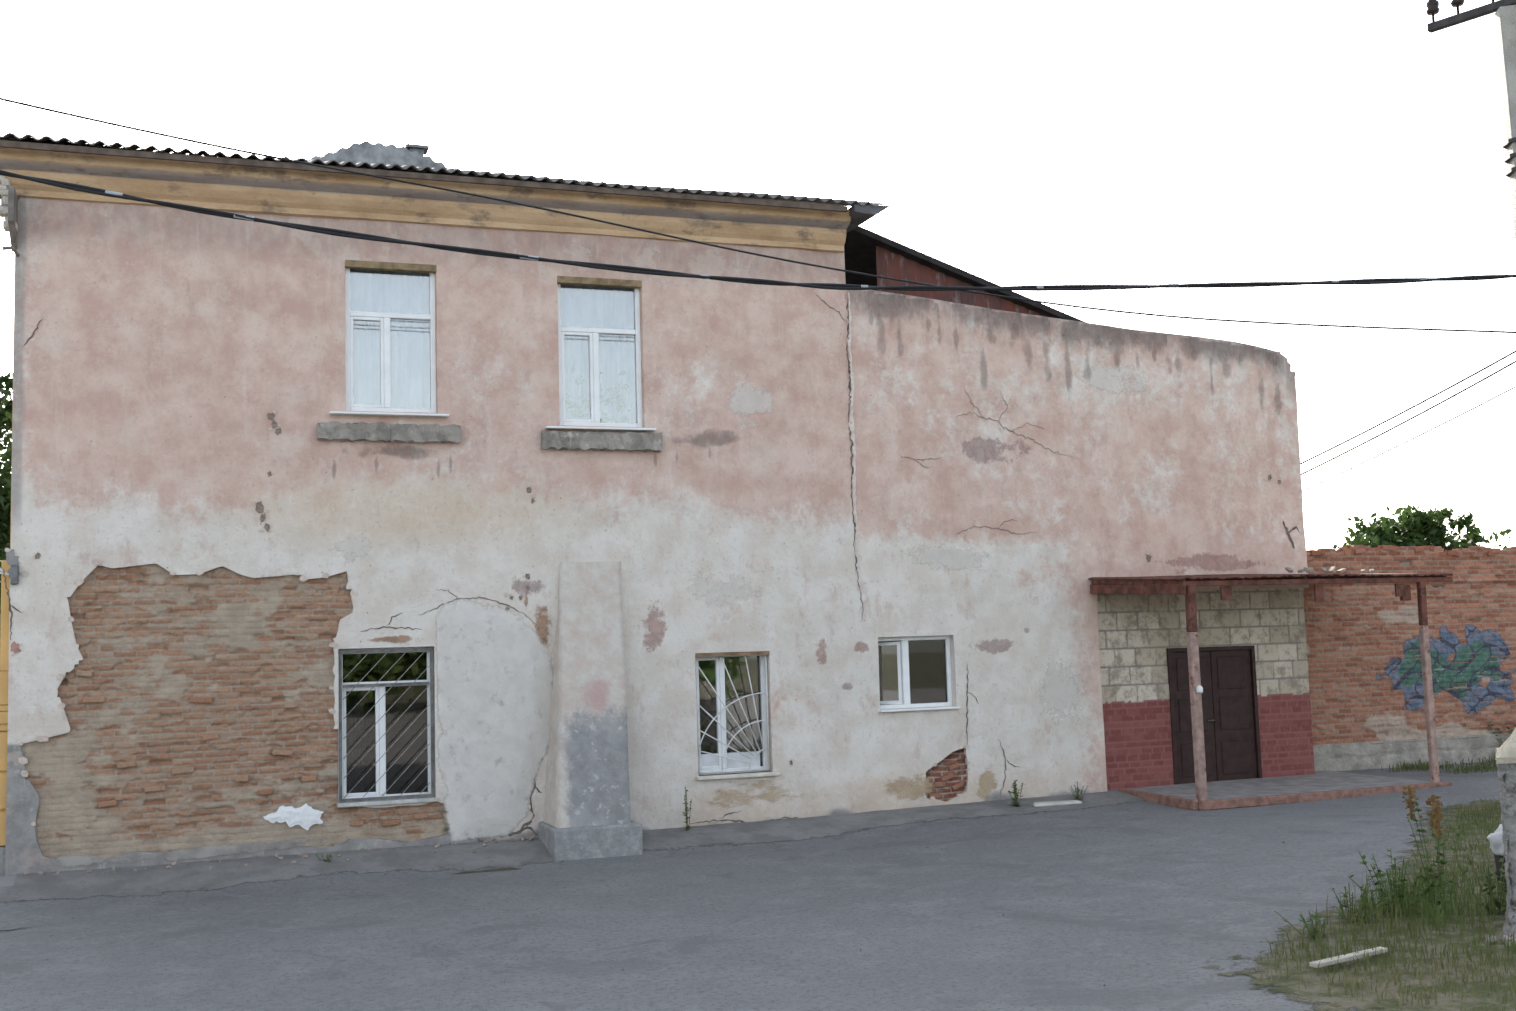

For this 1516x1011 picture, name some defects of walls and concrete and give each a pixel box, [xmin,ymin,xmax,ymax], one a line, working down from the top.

crack [817,292,864,616]
crack [958,385,1072,457]
crack [957,519,1028,535]
crack [361,589,535,632]
flaking render [18,559,449,859]
spalling [924,745,970,801]